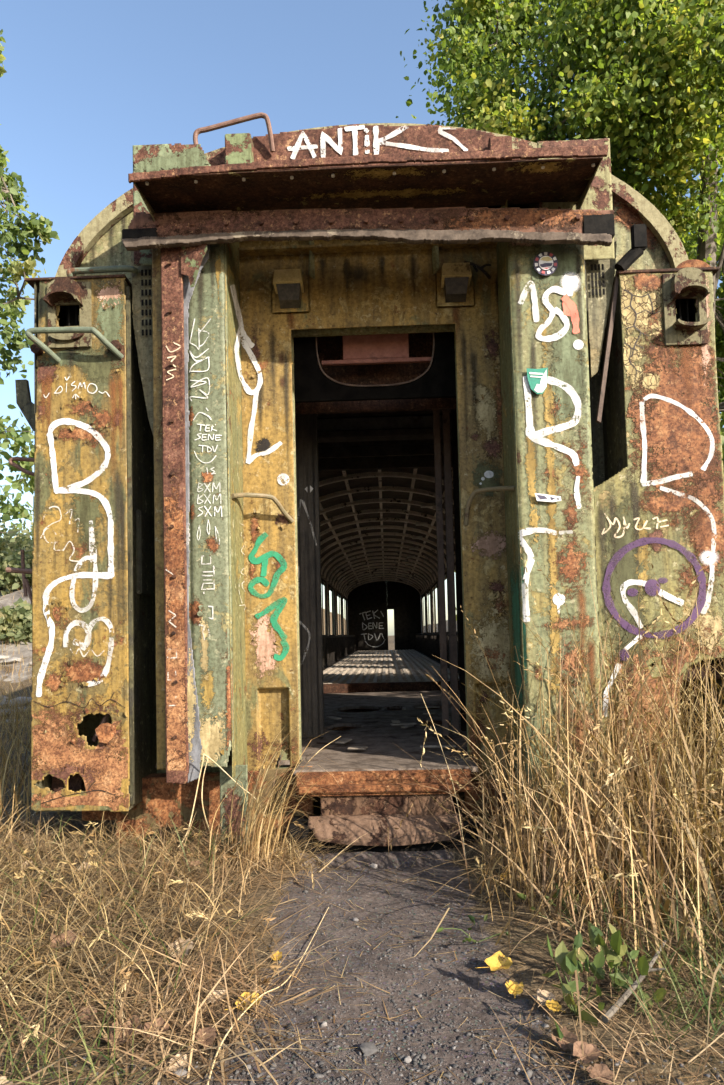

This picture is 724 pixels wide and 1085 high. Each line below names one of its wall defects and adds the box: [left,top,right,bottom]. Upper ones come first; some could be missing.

peeling [134,147,209,173]
rust [542,138,609,158]
rust [37,339,125,446]
peeling [471,384,504,501]
peeling [511,243,589,773]
crack [624,289,660,382]
rust [627,273,724,598]
rust [163,473,204,771]
peeling [468,558,528,724]
rust [535,428,724,792]